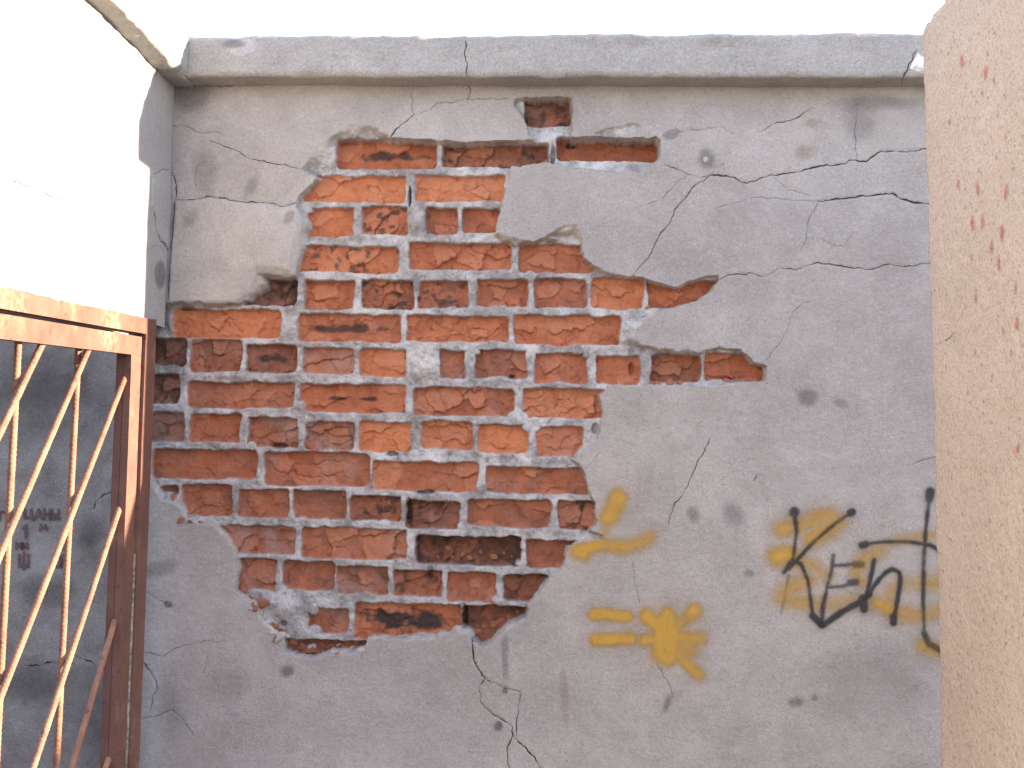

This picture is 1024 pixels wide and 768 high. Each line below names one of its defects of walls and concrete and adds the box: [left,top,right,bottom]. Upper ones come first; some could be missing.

crack [144,165,295,295]
crack [174,126,295,168]
crack [390,40,508,140]
crack [637,102,929,279]
spalling [150,96,767,660]
crack [472,639,540,768]